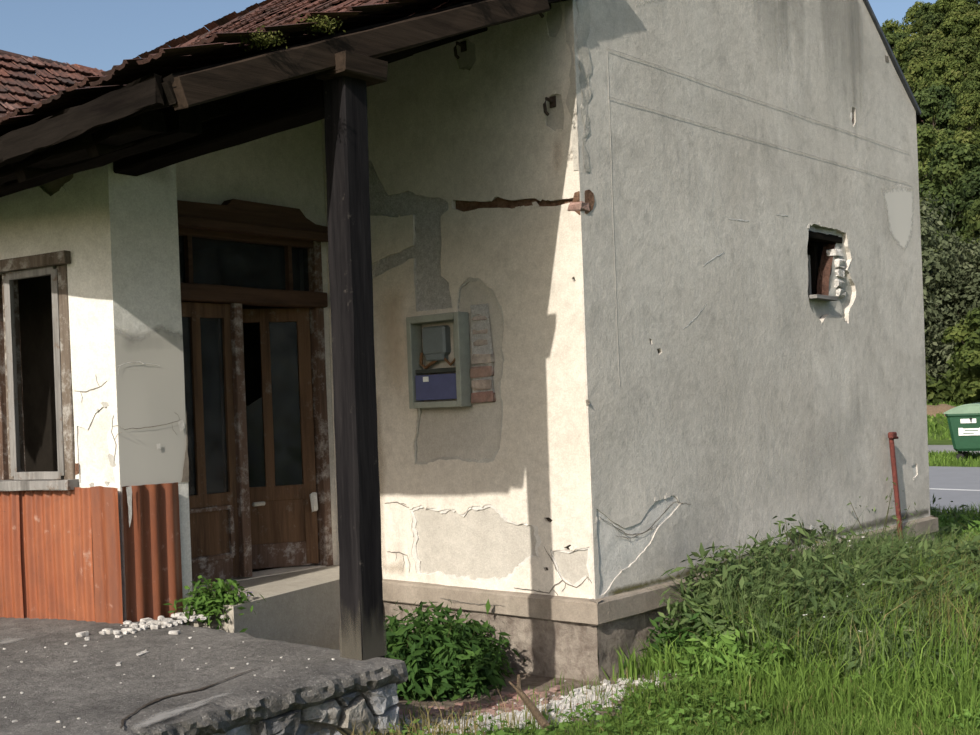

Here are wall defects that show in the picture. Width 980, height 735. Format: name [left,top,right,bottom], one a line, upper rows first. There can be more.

flaking render [567,201,590,212]
peeling [884,185,914,249]
crack [78,361,160,403]
flaking render [414,277,505,465]
crack [111,412,181,460]
flaking render [408,491,680,596]